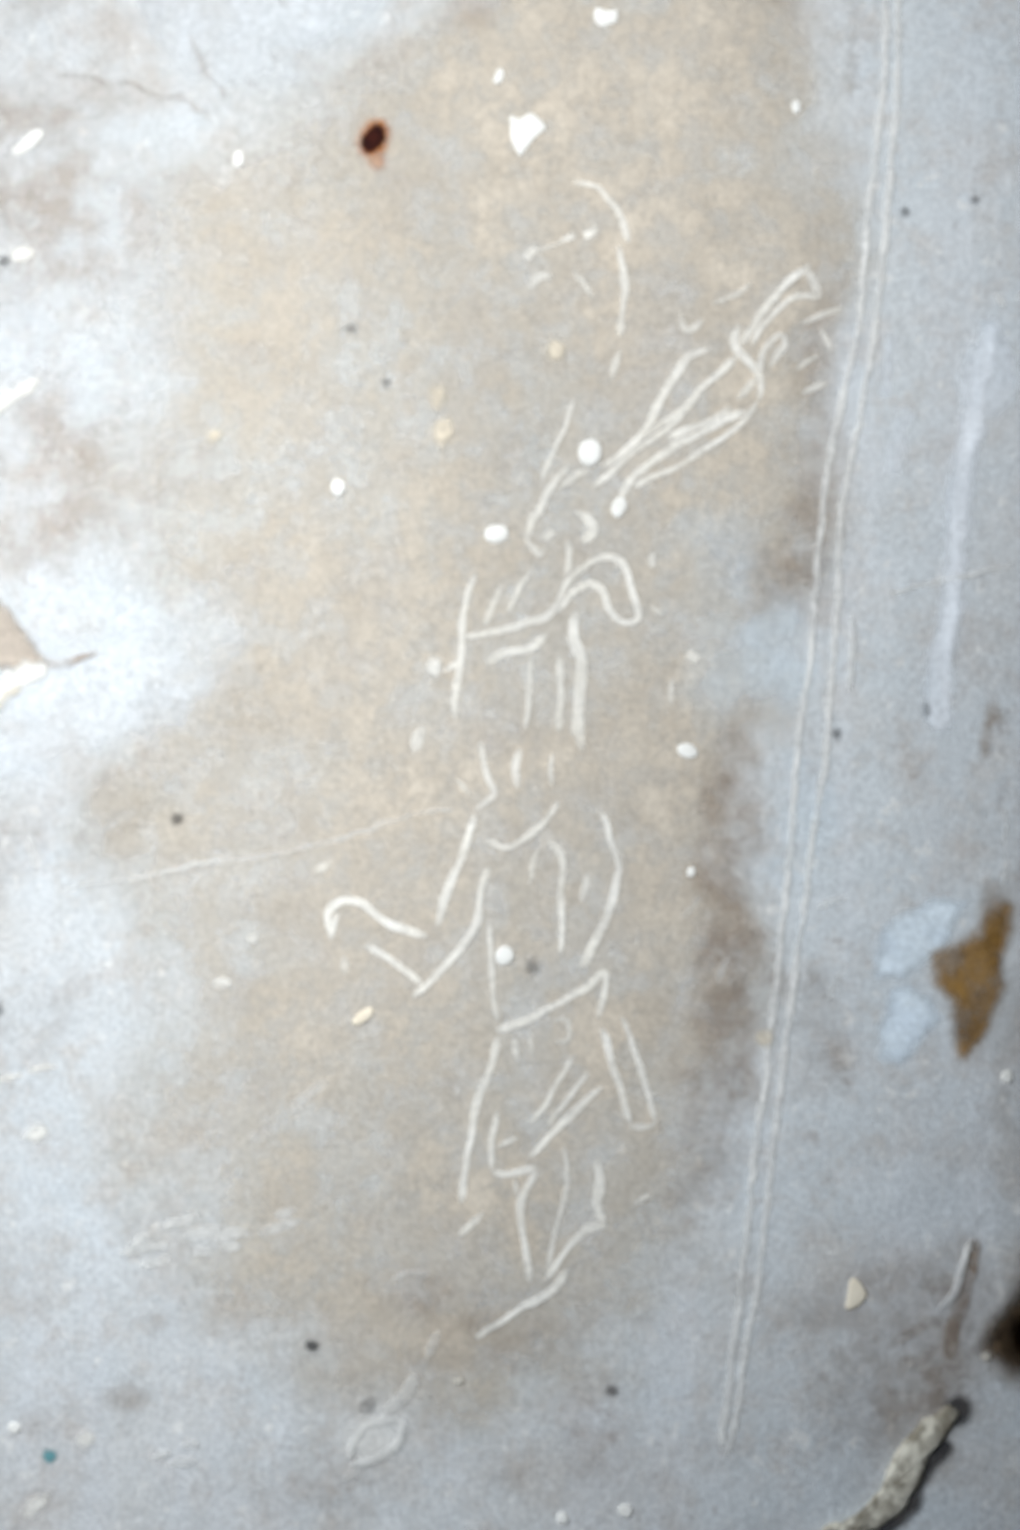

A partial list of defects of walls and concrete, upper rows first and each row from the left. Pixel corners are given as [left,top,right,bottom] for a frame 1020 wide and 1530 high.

spalling [0,605,46,700]
spalling [822,1397,969,1530]